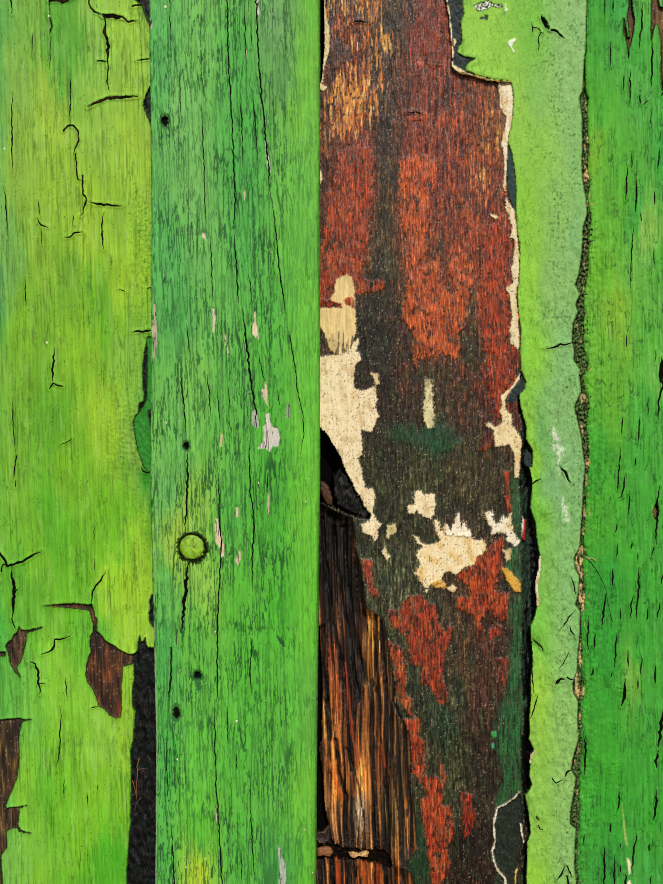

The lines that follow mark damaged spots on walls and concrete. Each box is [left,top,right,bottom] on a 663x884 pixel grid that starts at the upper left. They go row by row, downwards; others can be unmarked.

peeling [446,0,512,84]
crack [532,15,565,51]
crack [586,0,663,167]
peeling [623,0,636,51]
peeling [650,0,663,91]
crack [3,97,13,235]
peeling [320,275,357,355]
peeling [507,373,526,404]
crack [548,55,663,884]
peeling [0,626,43,679]
peeling [44,603,156,884]
peeling [0,718,32,884]